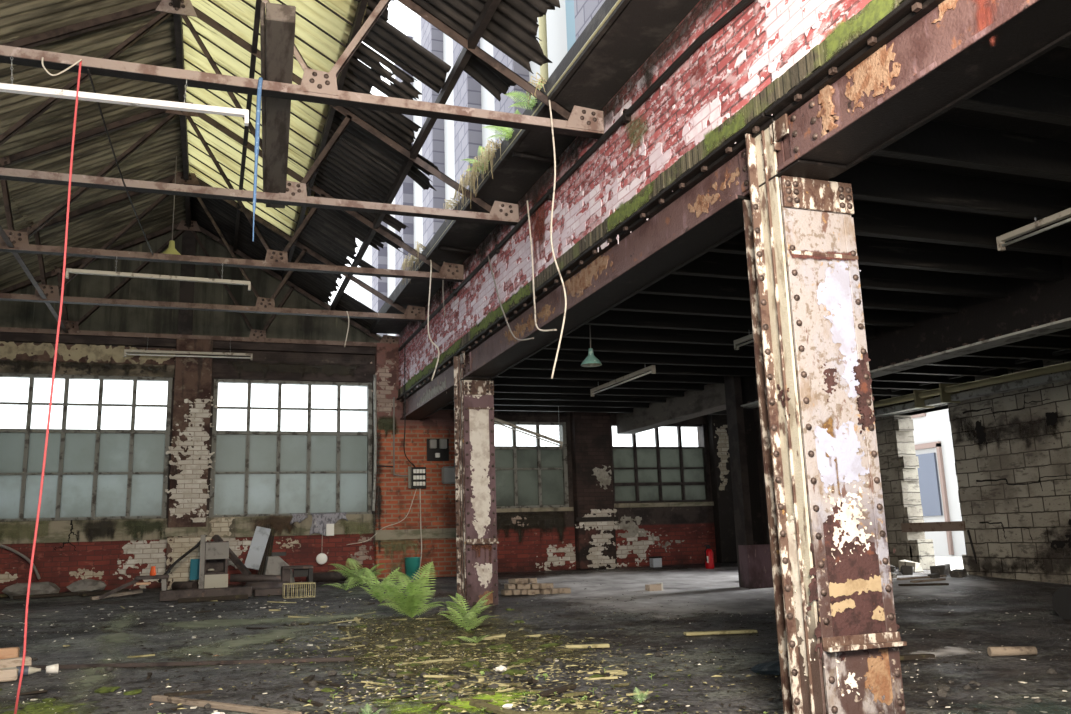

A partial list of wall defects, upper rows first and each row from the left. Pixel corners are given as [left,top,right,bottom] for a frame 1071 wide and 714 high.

corrosion [931,0,958,24]
corrosion [813,43,901,137]
peeling [370,0,840,416]
peeling [65,393,252,590]
peeling [463,387,491,539]
peeling [535,508,685,571]
corrosion [823,417,835,437]
peeling [786,513,882,696]
peeling [814,421,875,565]
corrosion [806,453,903,705]
water stain [966,414,1065,449]
water stain [967,525,1071,576]